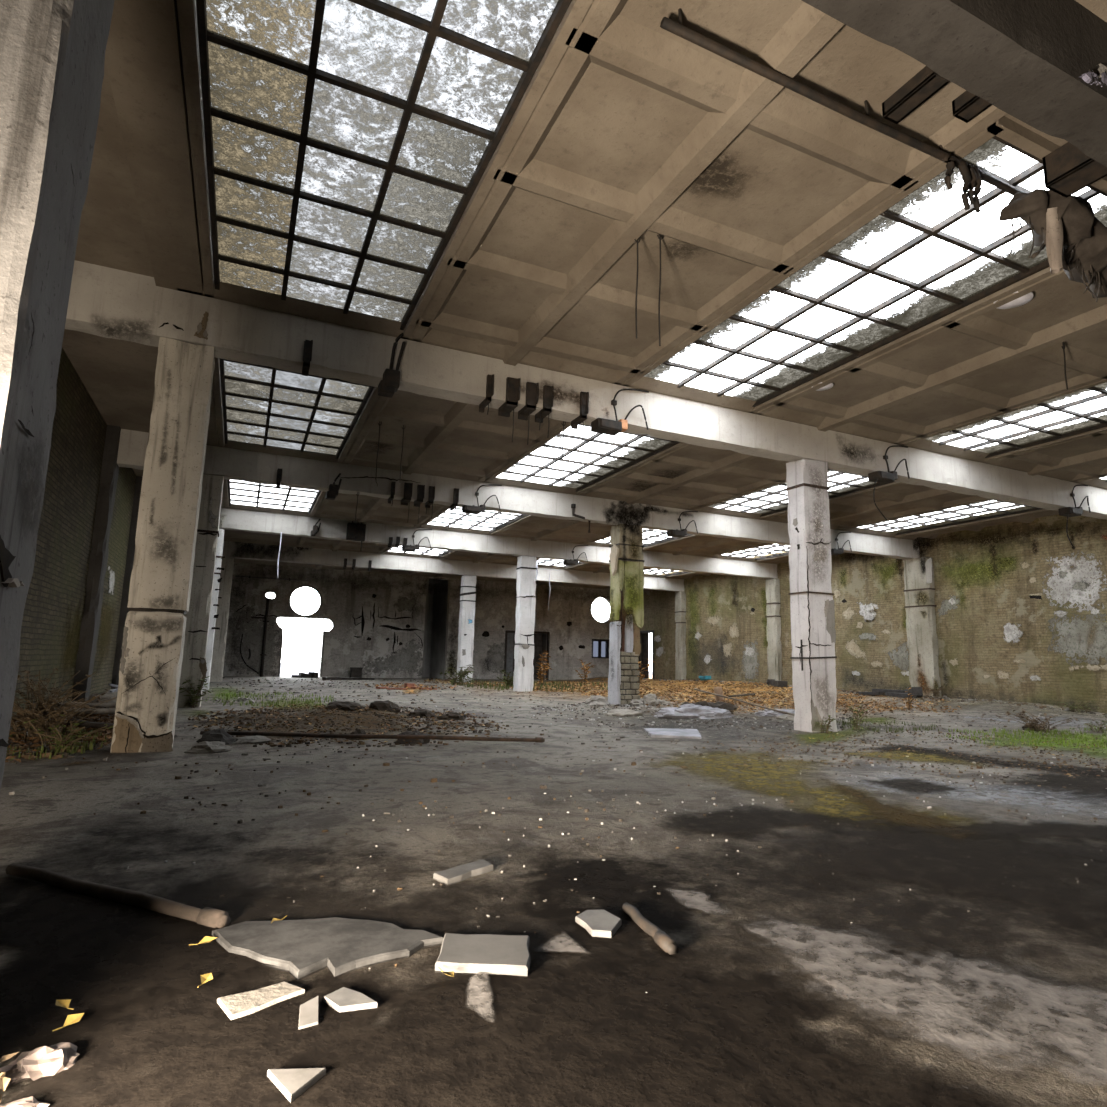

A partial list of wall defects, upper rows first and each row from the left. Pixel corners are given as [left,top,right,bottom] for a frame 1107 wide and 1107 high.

peeling [1080,63,1107,87]
leakage [919,522,1100,575]
leakage [840,553,883,586]
peeling [1020,550,1107,672]
peeling [824,589,909,676]
peeling [1003,622,1023,644]
leakage [694,636,739,672]